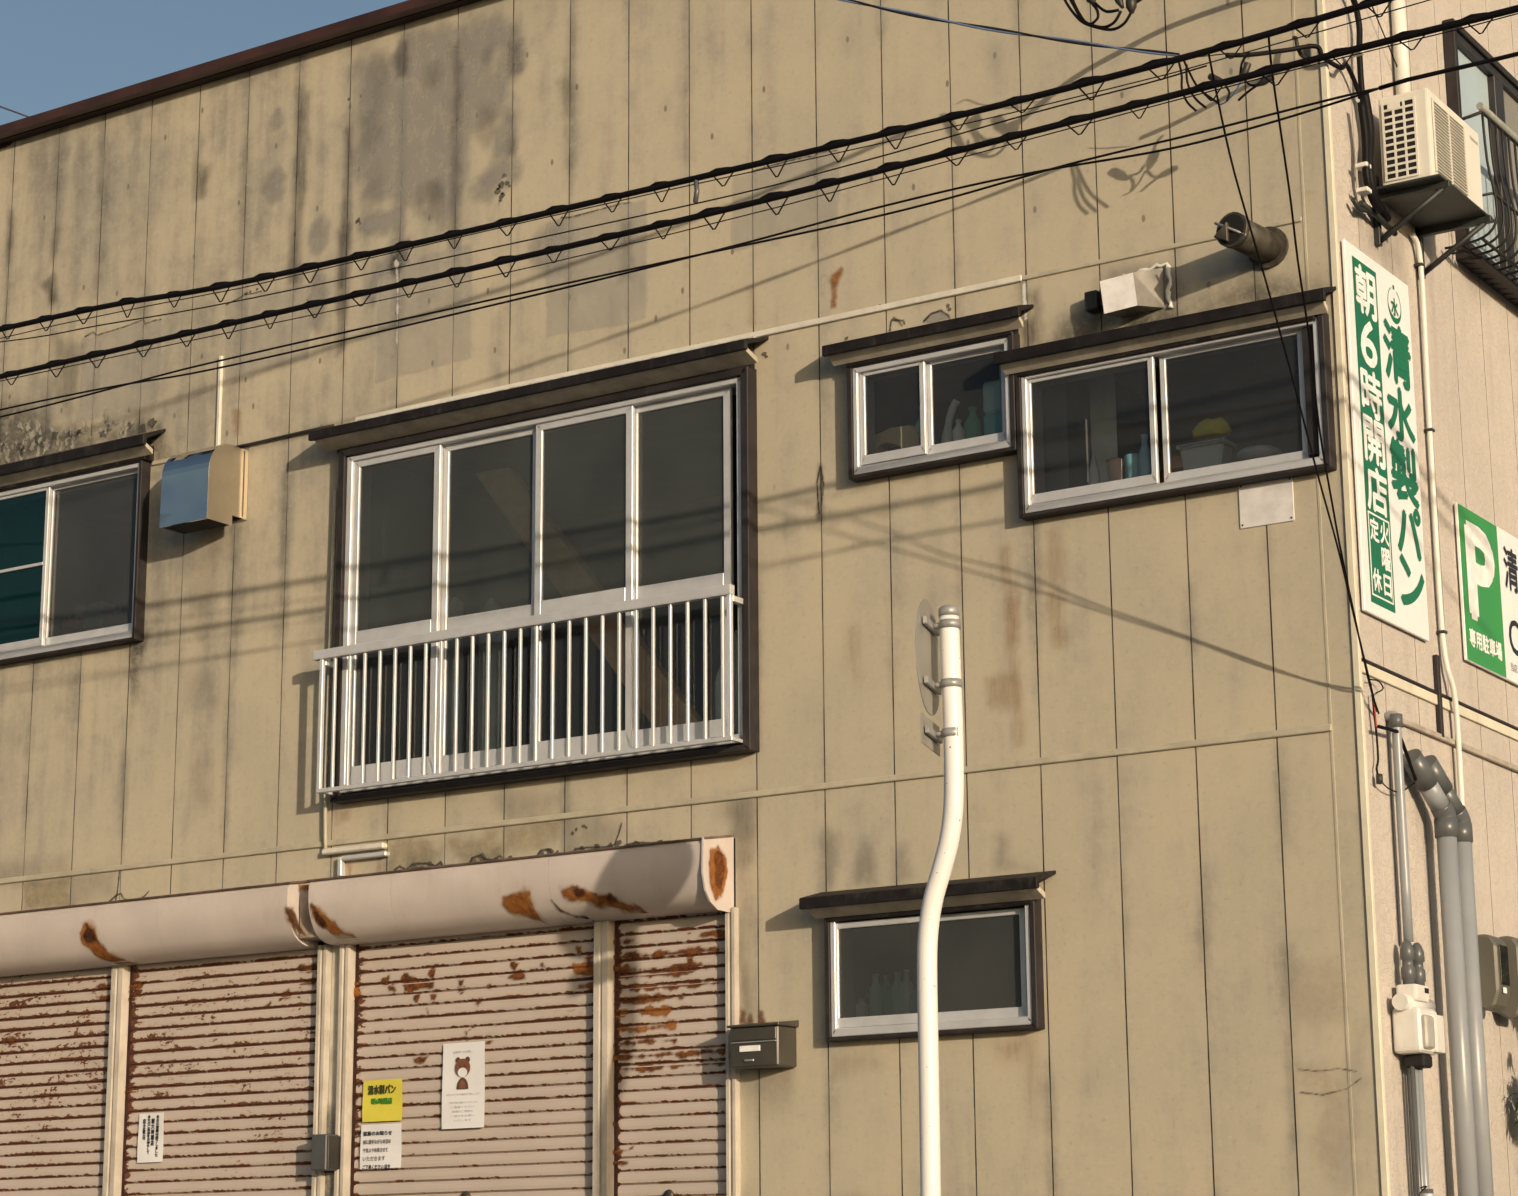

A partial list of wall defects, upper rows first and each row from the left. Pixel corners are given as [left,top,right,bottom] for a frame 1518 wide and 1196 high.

water stain [355,24,522,343]
corrosion [831,269,842,307]
corrosion [286,884,348,936]
corrosion [80,924,145,1002]
corrosion [267,963,317,1006]
corrosion [381,966,436,1002]
corrosion [508,962,525,980]
corrosion [572,946,594,990]
corrosion [613,929,726,1073]
corrosion [613,1147,633,1165]